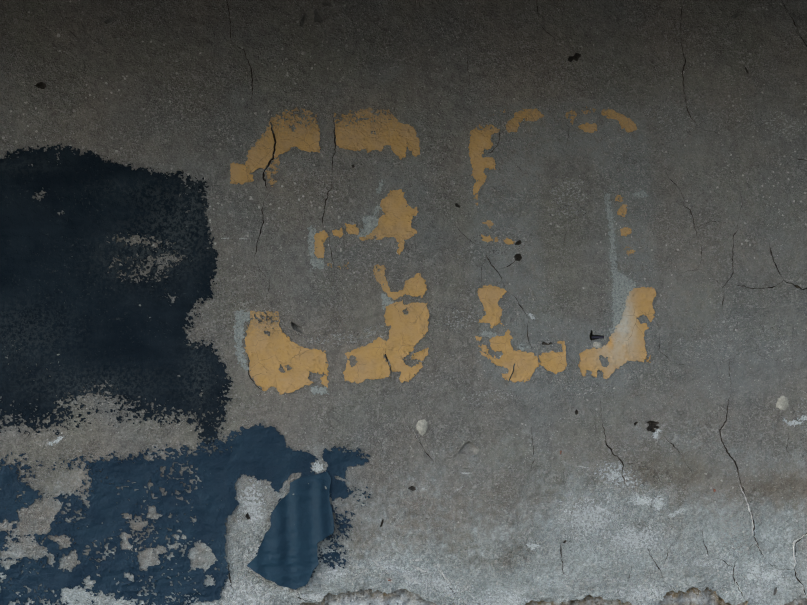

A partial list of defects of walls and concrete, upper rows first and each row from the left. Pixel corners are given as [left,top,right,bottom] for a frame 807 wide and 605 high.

peeling [0,143,371,605]
crack [253,128,277,294]
peeling [230,107,321,187]
crack [322,119,336,272]
peeling [314,189,419,270]
peeling [343,264,430,384]
crack [457,227,534,350]
peeling [475,285,567,383]
peeling [578,287,656,379]
crack [665,170,807,317]
crack [600,399,640,517]
crack [702,355,807,598]